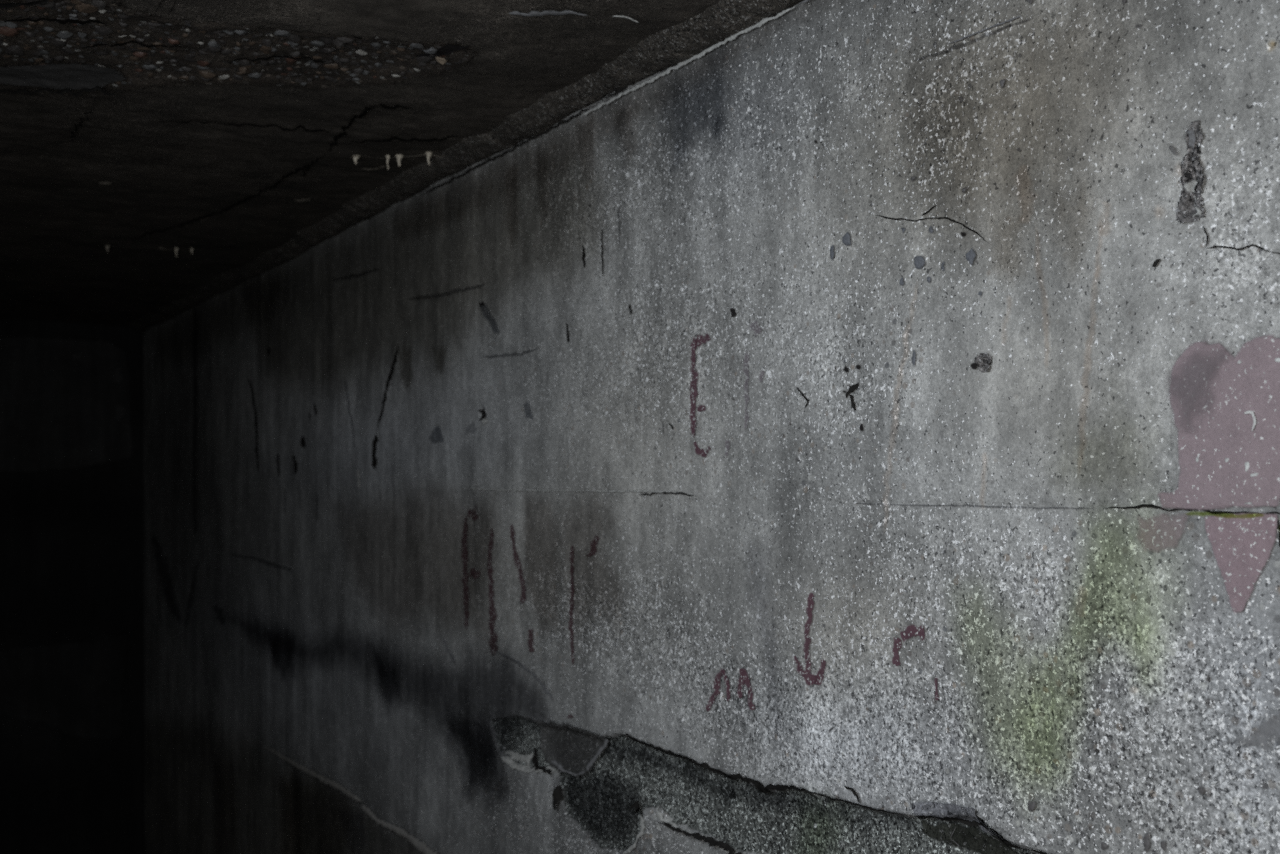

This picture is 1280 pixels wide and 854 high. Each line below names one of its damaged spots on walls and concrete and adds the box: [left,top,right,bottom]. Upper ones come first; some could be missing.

crack [420,0,808,196]
crack [129,104,461,241]
damp [350,152,441,170]
spalling [1169,120,1205,223]
crack [1203,227,1280,254]
spalling [492,717,1036,854]
flaking render [1143,832,1167,854]